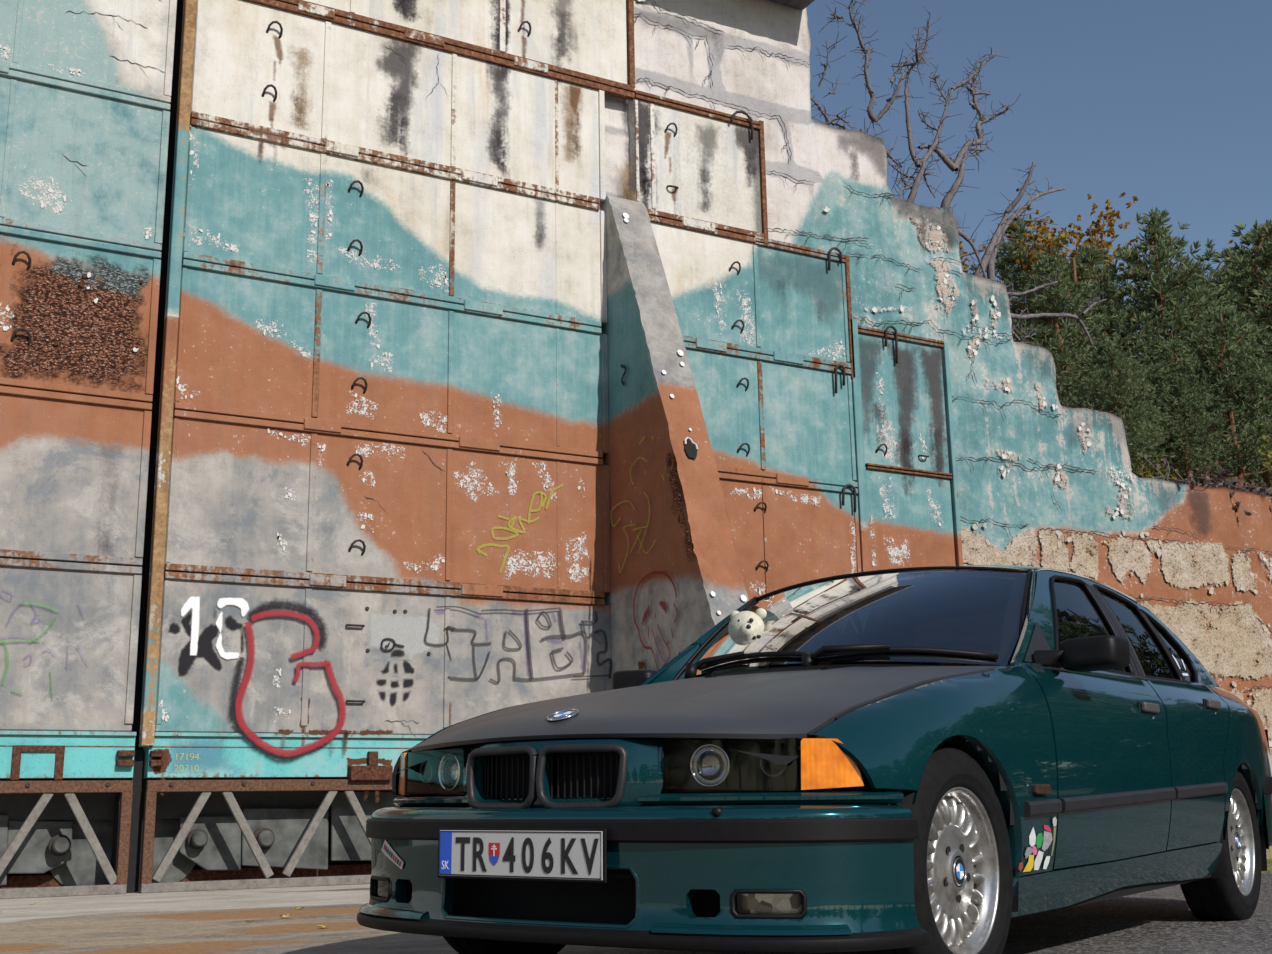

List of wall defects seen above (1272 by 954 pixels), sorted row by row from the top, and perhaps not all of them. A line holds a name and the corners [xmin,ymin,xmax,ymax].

crack [67,10,163,73]
rust [248,102,287,160]
damp [377,40,417,154]
damp [395,0,416,18]
damp [489,0,510,172]
crack [634,0,814,191]
crack [845,183,894,205]
crack [768,228,1062,427]
peeling [910,214,1011,360]
damp [891,348,946,492]
peeling [927,488,943,528]
peeling [961,464,1272,765]